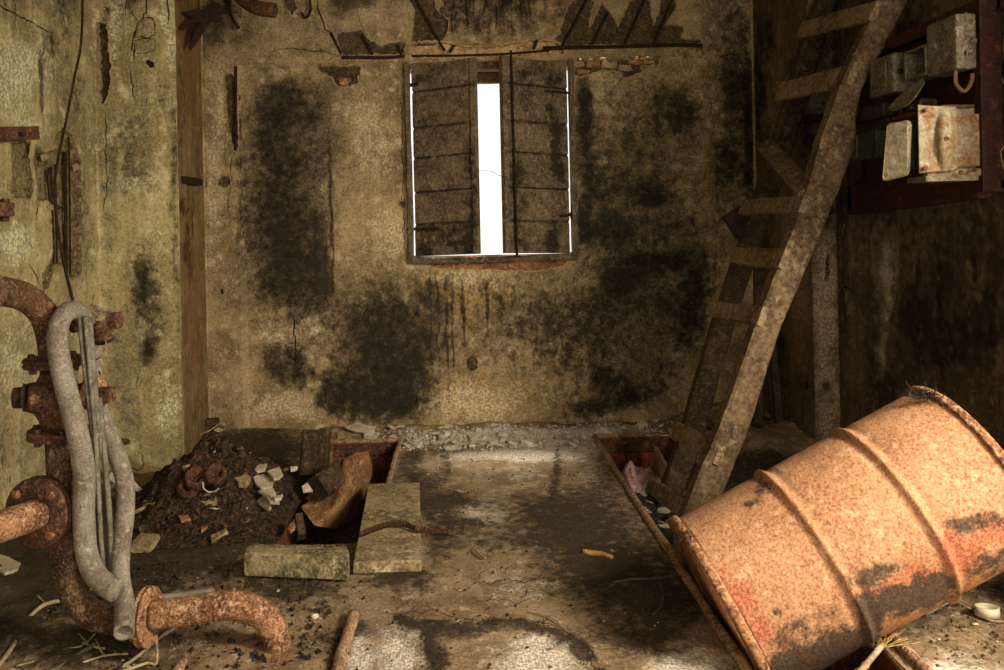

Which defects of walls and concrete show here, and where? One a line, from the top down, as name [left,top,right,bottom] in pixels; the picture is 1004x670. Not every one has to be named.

spalling [96,19,113,107]
crack [125,0,227,123]
spalling [316,0,703,88]
crack [99,112,108,207]
leakage [248,87,334,309]
leakage [575,81,627,244]
leakage [263,345,314,386]
leakage [322,280,465,416]